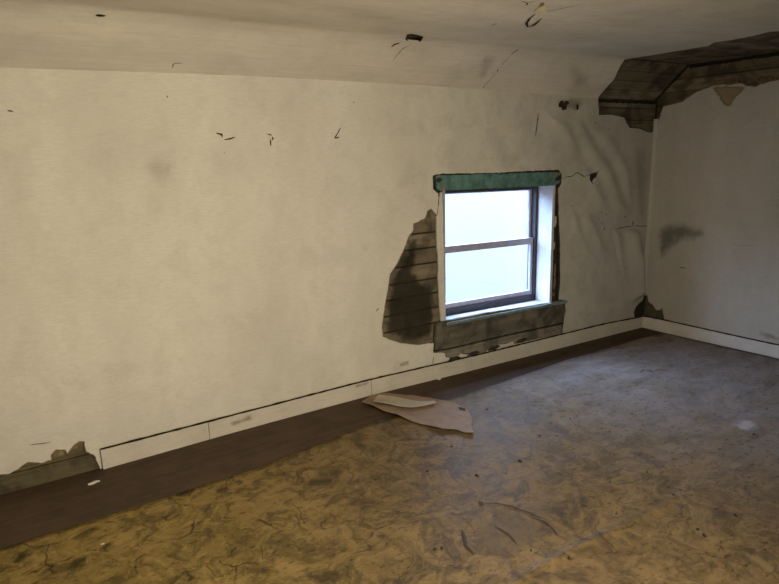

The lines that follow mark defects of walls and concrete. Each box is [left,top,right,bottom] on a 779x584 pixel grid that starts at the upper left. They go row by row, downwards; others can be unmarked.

crack [563,170,599,184]
peeling [382,199,439,345]
spalling [634,295,664,319]